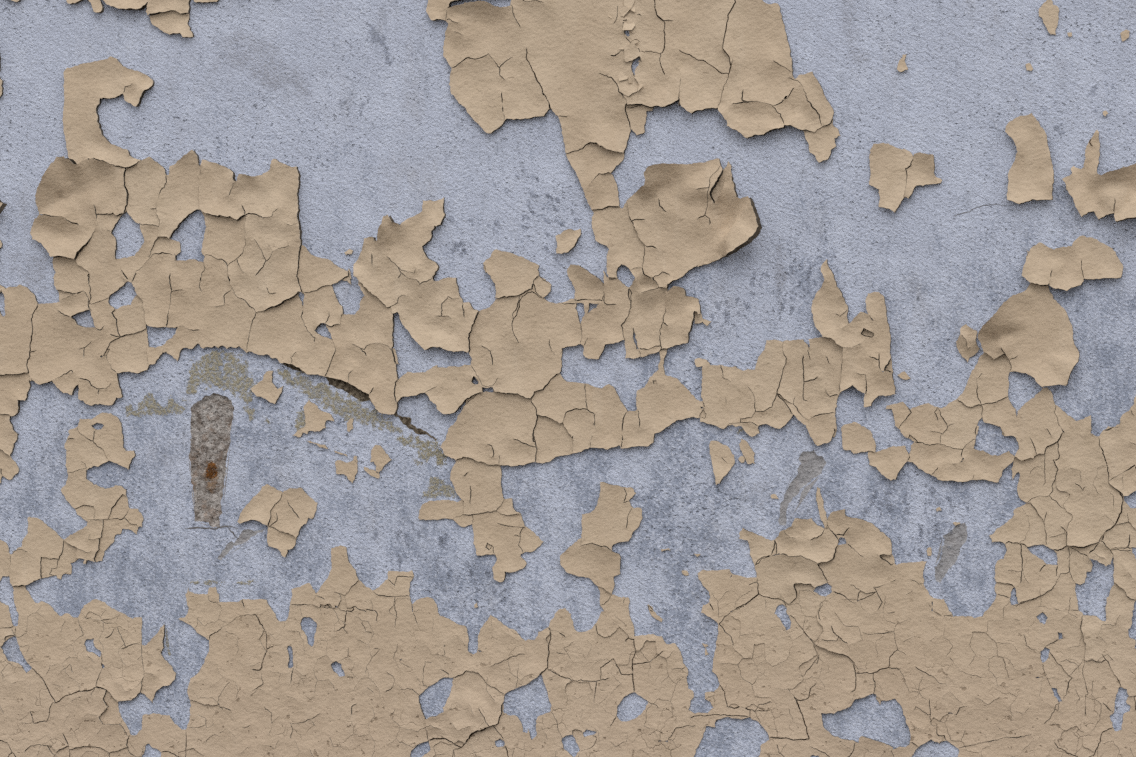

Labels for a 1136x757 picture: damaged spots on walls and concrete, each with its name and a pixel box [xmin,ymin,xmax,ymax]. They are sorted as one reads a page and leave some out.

peeling [621,0,841,162]
peeling [0,0,758,466]
rust [205,462,218,490]
crack [282,363,370,402]
crack [393,413,437,441]
peeling [695,259,895,446]
crack [31,672,111,757]
peeling [186,580,552,757]
crack [435,711,509,757]
peeling [494,569,918,757]
crack [737,584,897,692]
peeling [814,496,1136,757]